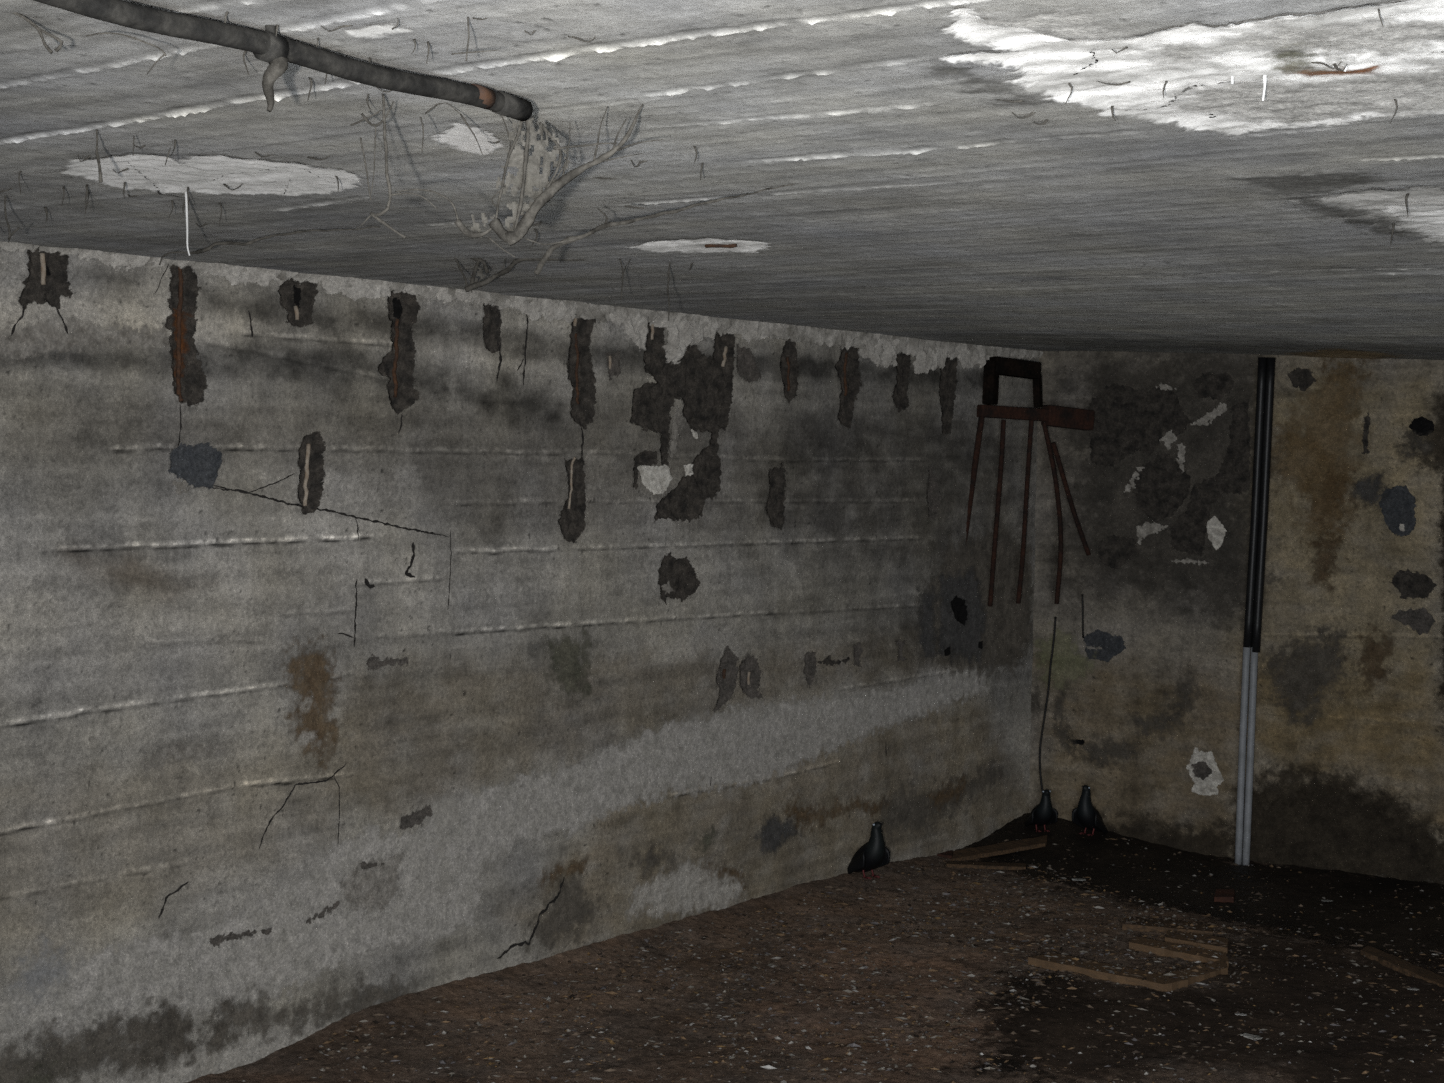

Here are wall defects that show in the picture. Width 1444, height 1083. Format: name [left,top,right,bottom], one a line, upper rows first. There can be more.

damp [931,67,1030,106]
spalling [11,247,73,336]
spalling [155,264,246,495]
spalling [297,432,326,515]
spalling [378,290,421,434]
spalling [558,318,621,543]
spalling [630,323,761,523]
damp [1243,173,1392,231]
damp [1410,395,1444,610]
crack [259,764,346,849]
damp [0,532,1197,1083]
damp [942,764,1444,1083]